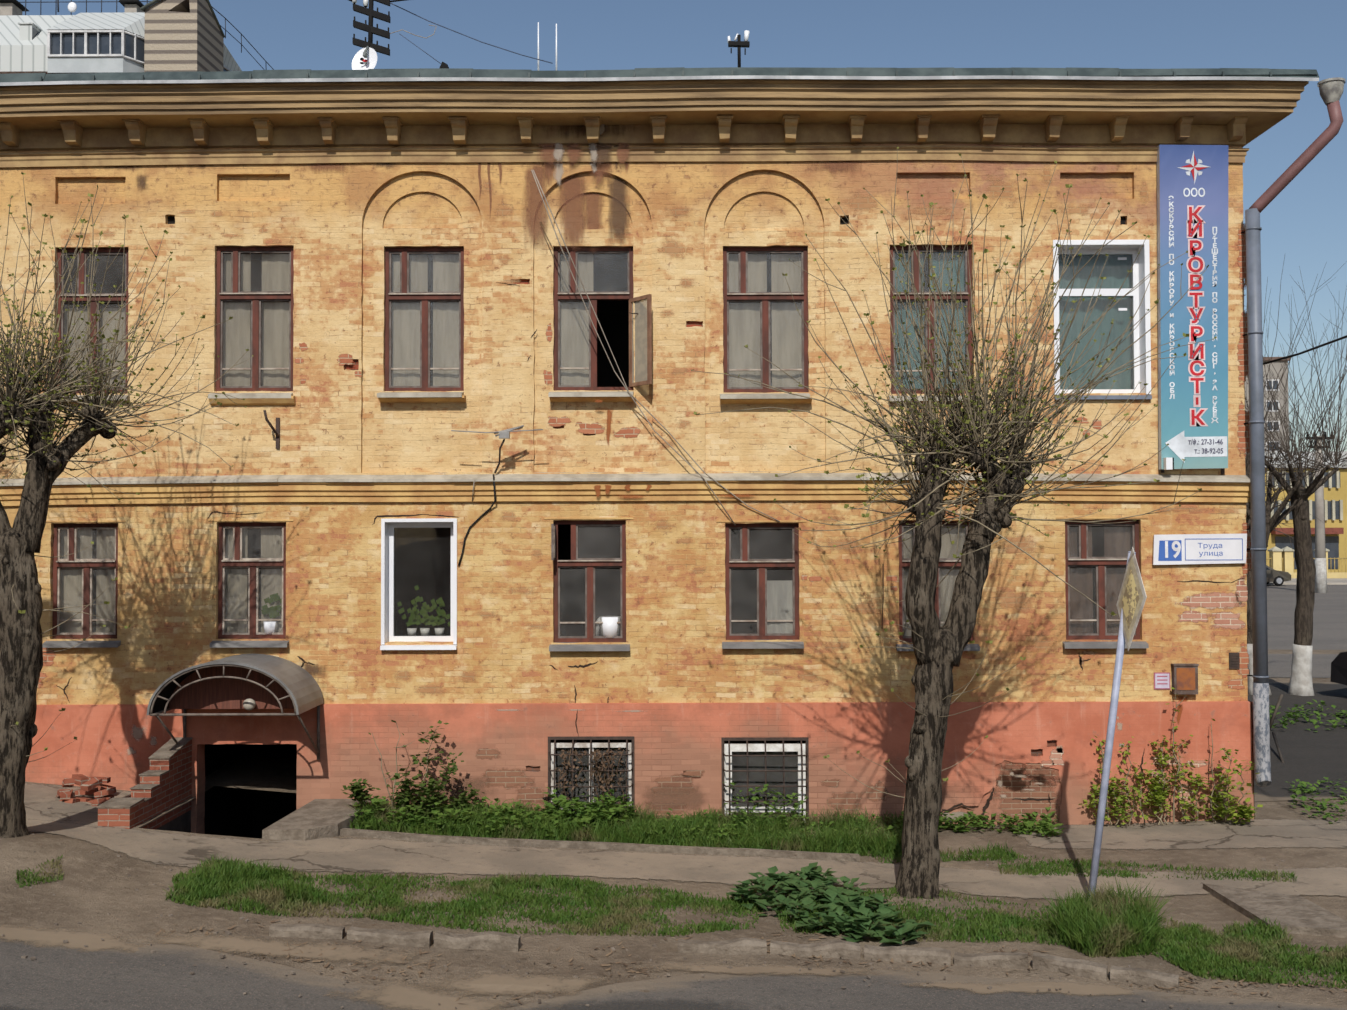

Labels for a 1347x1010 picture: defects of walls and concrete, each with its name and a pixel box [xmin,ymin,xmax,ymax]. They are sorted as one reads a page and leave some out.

peeling [1175,514,1251,689]
peeling [992,740,1064,825]